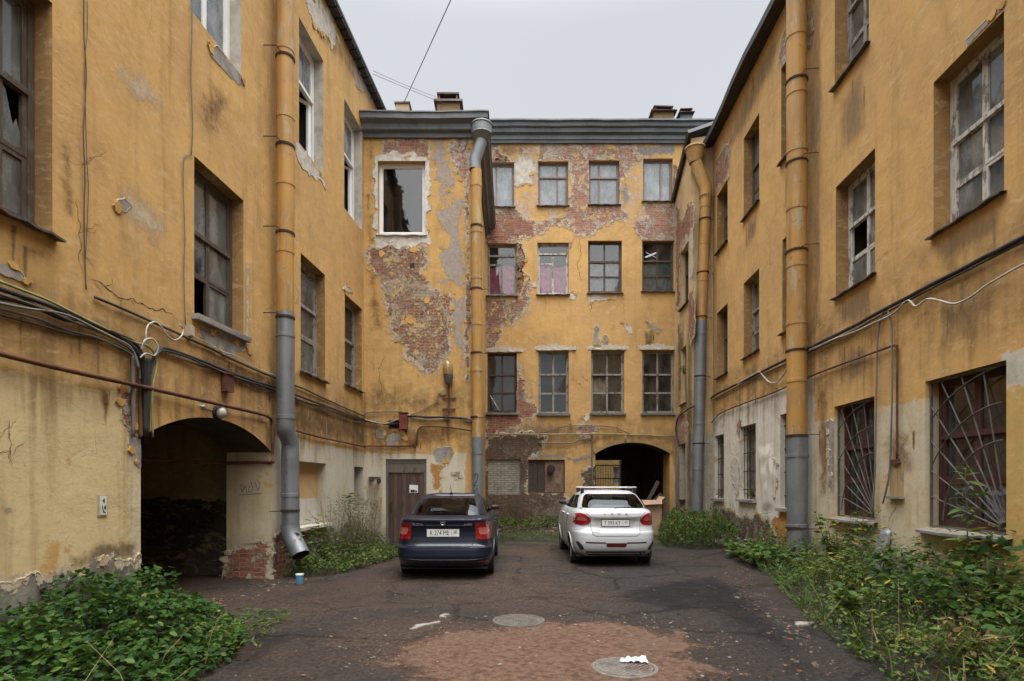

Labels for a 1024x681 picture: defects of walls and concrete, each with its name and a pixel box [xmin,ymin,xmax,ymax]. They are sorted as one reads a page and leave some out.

peeling [305,0,341,51]
flaking render [295,140,326,190]
flaking render [715,139,731,190]
flaking render [0,261,34,285]
crack [76,199,182,322]
flaking render [364,138,473,382]
flaking render [485,144,696,524]
flaking render [430,446,463,492]
flaking render [219,528,293,579]
flaking render [0,551,142,666]